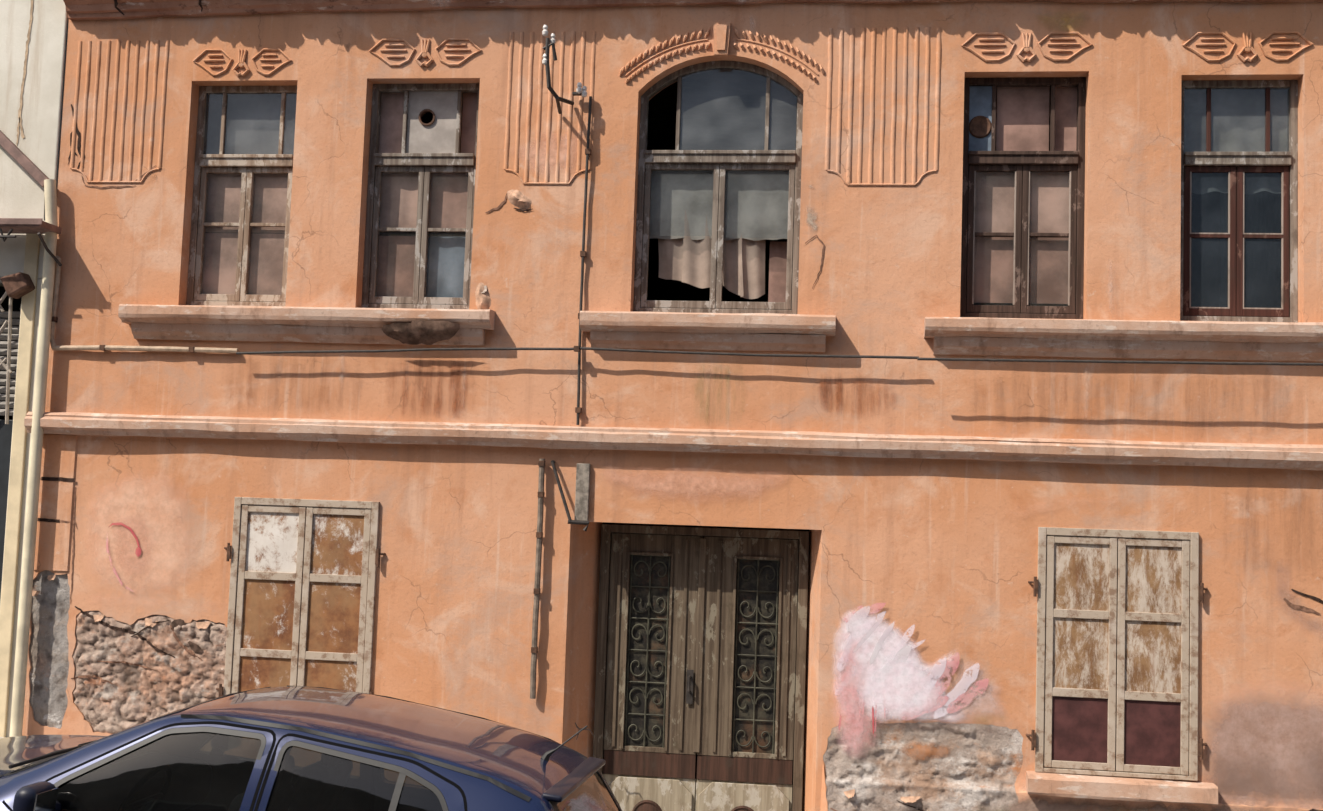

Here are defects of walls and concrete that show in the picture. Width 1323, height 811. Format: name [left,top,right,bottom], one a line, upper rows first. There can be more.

flaking render [29,570,227,734]
flaking render [823,720,1198,811]
leakage [1213,701,1323,802]